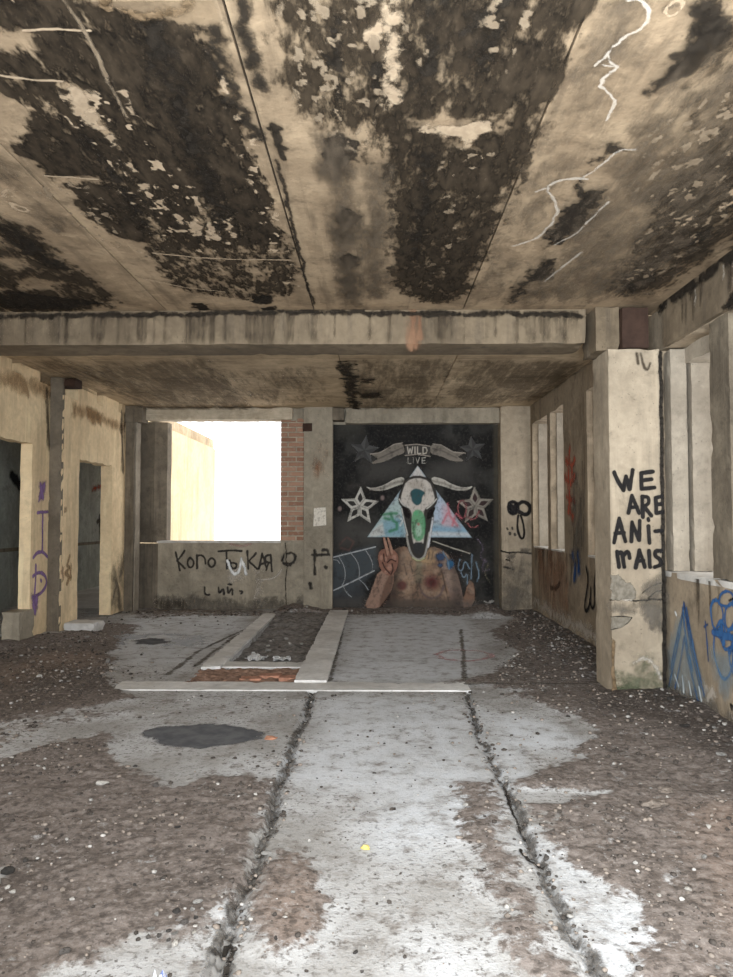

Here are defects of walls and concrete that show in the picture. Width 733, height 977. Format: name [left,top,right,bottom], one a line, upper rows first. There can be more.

water stain [0,0,733,322]
water stain [335,360,383,410]
crack [203,631,343,977]
crack [444,629,608,977]